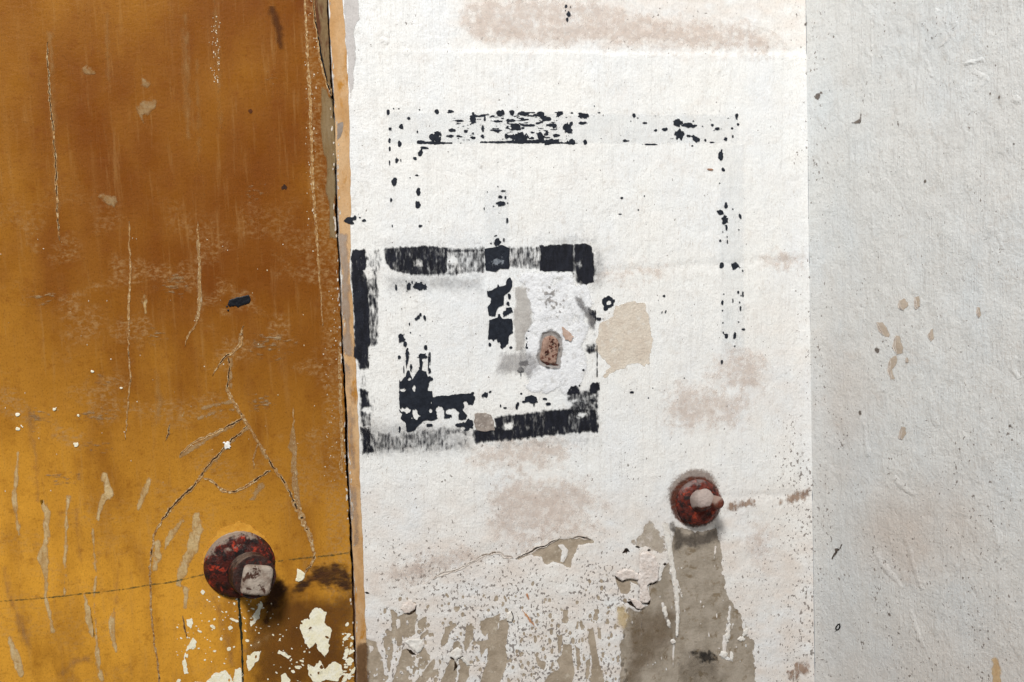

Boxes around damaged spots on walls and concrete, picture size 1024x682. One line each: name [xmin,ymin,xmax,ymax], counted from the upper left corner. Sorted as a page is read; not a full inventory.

peeling [595,301,653,378]
crack [148,327,316,682]
rust [671,477,755,527]
crack [433,551,513,580]
spalling [278,521,756,682]
peeling [176,603,263,682]